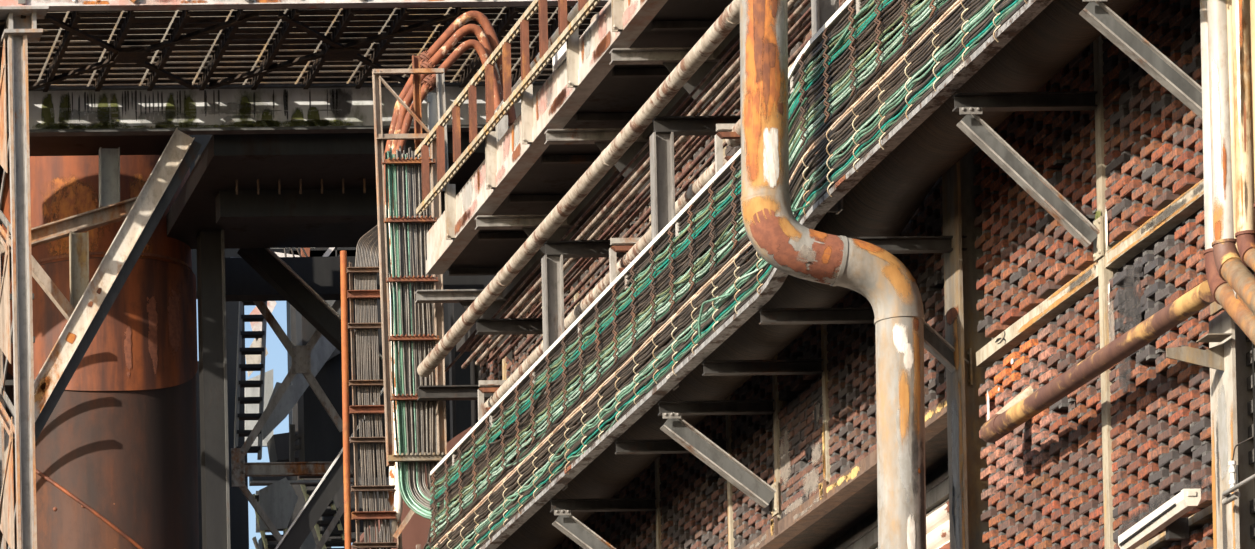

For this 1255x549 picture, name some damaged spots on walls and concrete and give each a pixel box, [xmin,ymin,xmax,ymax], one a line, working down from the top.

corrosion [581,10,611,63]
corrosion [496,122,521,182]
corrosion [742,0,916,300]
corrosion [130,174,147,199]
corrosion [0,34,109,549]
peeling [893,324,914,371]
peeling [896,409,911,496]
peeling [907,515,916,549]